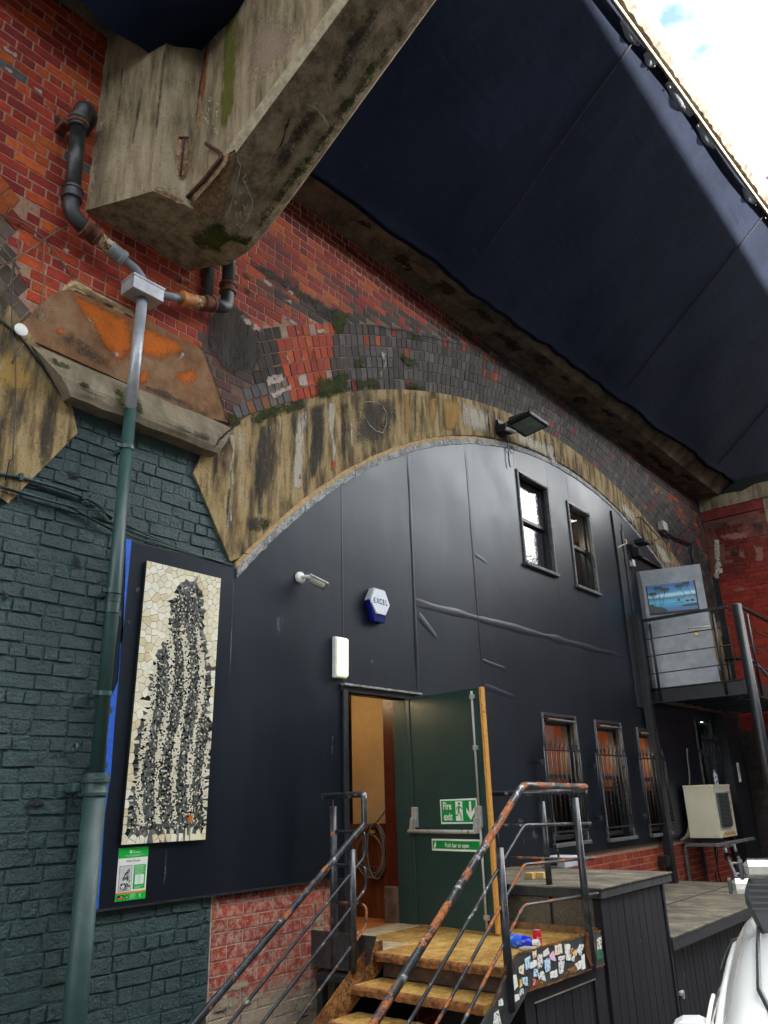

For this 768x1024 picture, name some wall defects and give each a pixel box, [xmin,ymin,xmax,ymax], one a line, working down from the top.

damp [220,10,295,124]
damp [332,11,377,85]
damp [272,113,318,175]
corrosion [75,297,181,360]
damp [0,353,36,393]
damp [227,414,281,531]
damp [283,394,500,489]
damp [518,433,562,463]
damp [655,542,671,564]